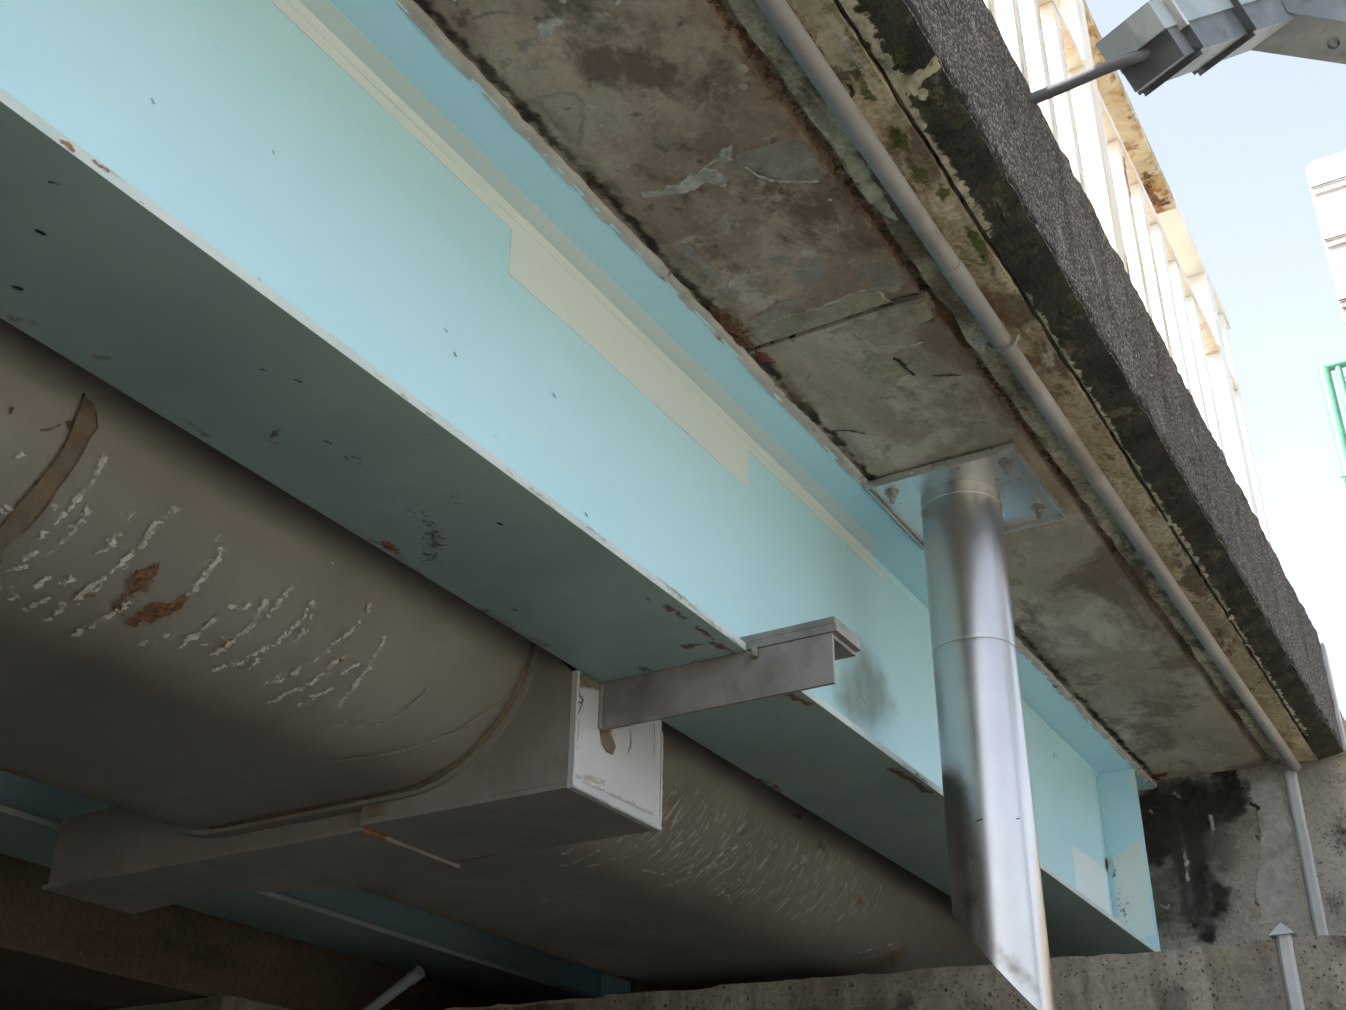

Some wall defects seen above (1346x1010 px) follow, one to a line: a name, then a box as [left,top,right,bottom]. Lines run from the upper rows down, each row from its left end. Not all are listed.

leakage [415,0,584,160]
leakage [590,181,665,257]
leakage [641,145,733,198]
leakage [673,244,936,481]
peeling [790,0,992,238]
crack [873,284,930,308]
corrosion [1123,158,1171,207]
peeling [0,451,180,621]
corrosion [113,562,190,627]
peeling [138,581,316,672]
peeling [1025,293,1308,735]
leakage [1014,625,1248,944]